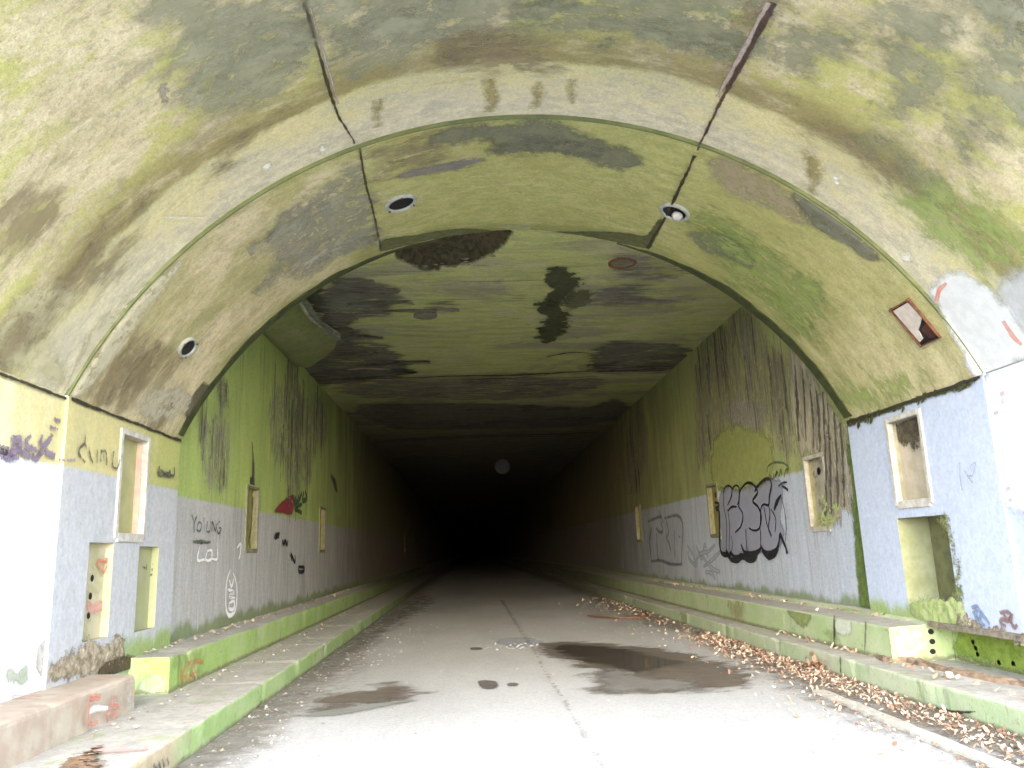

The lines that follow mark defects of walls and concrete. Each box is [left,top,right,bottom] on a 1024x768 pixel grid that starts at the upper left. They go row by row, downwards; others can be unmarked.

crack [303,2,381,249]
water stain [371,115,644,178]
crack [646,2,777,249]
water stain [247,166,490,295]
water stain [533,219,694,343]
water stain [304,278,693,430]
spalling [37,634,135,684]